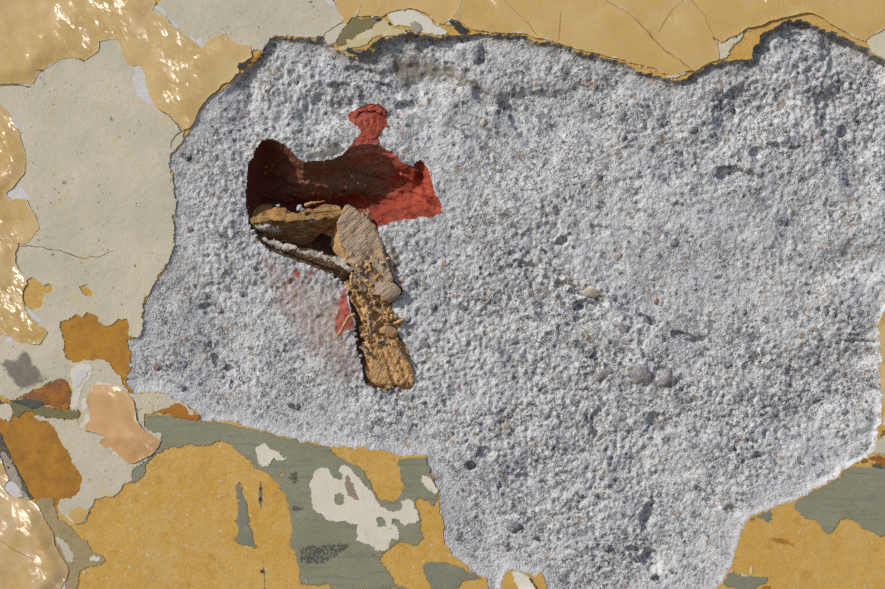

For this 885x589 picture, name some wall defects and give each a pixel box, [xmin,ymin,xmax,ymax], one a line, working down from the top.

peeling [0,0,262,131]
peeling [335,0,885,78]
spalling [245,104,442,245]
peeling [0,101,49,345]
spalling [289,225,337,257]
spalling [348,290,385,390]
peeling [0,398,43,421]
peeling [70,363,94,410]
peeling [79,380,161,468]
peeling [0,451,74,589]
spalling [506,521,524,533]
peeling [512,570,535,589]